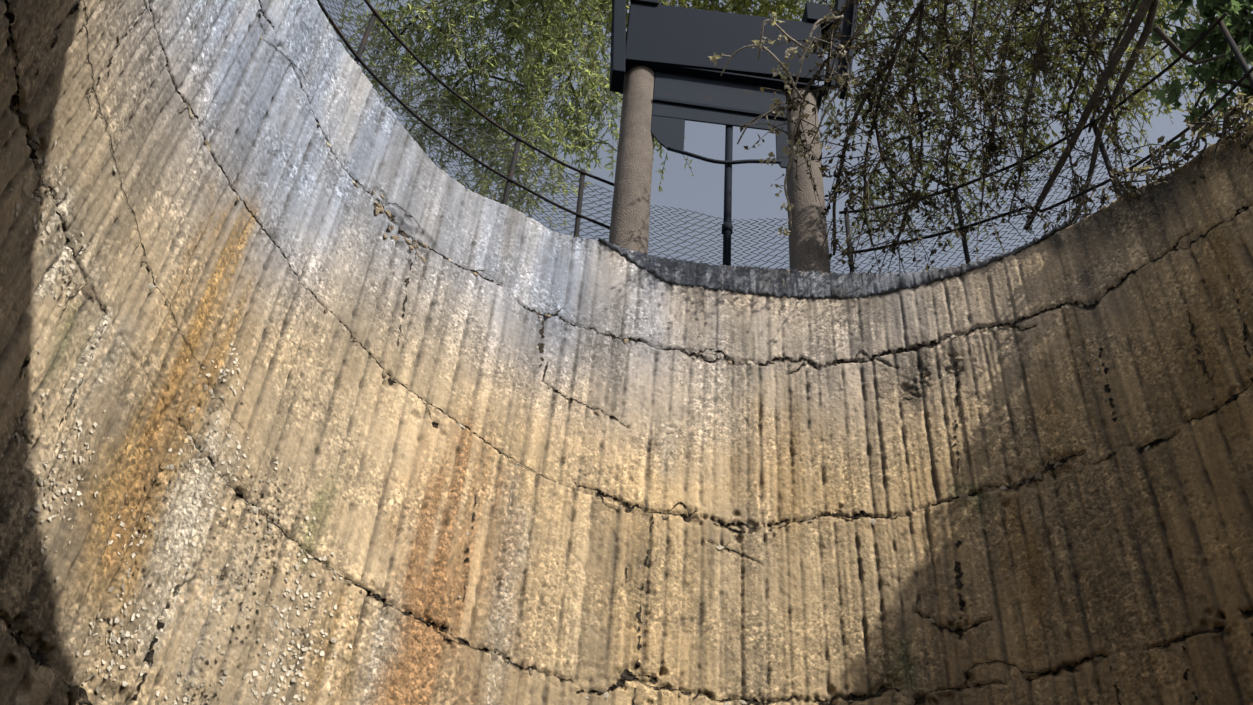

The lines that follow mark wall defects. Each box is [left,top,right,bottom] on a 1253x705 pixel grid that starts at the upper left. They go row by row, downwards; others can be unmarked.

crack [3,0,107,319]
crack [83,1,244,429]
rust [88,217,254,580]
crack [143,0,1253,565]
crack [0,616,93,705]
rust [369,427,479,705]
crack [178,417,1108,705]
crack [1153,608,1253,647]